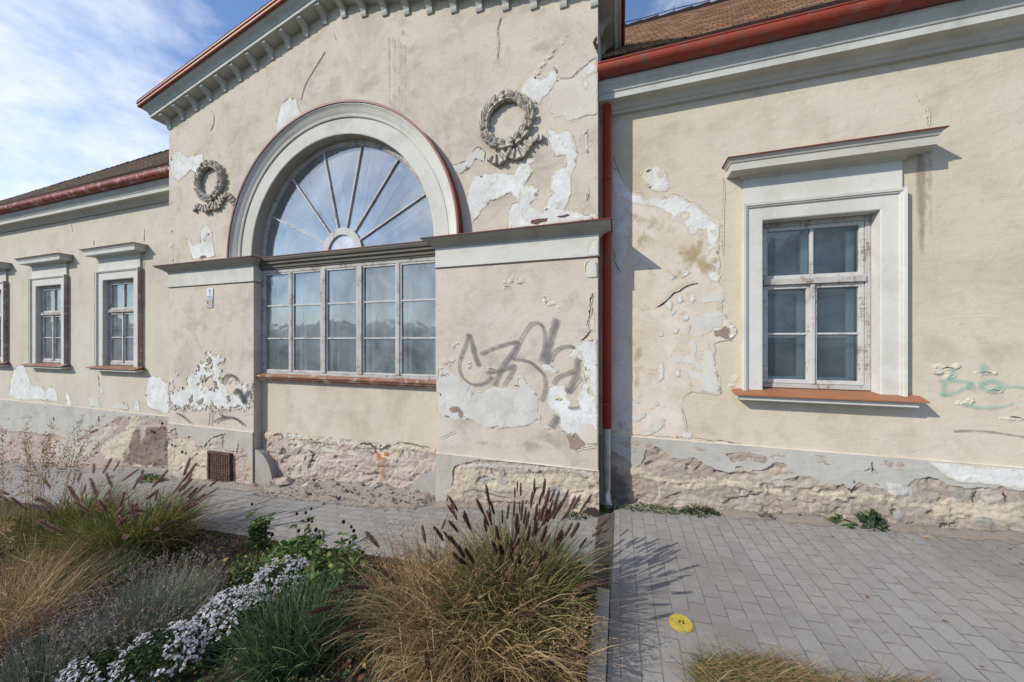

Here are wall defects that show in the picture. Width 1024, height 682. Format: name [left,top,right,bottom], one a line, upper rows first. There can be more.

peeling [170,148,203,182]
peeling [185,223,215,260]
peeling [436,59,1024,533]
spalling [0,349,255,484]